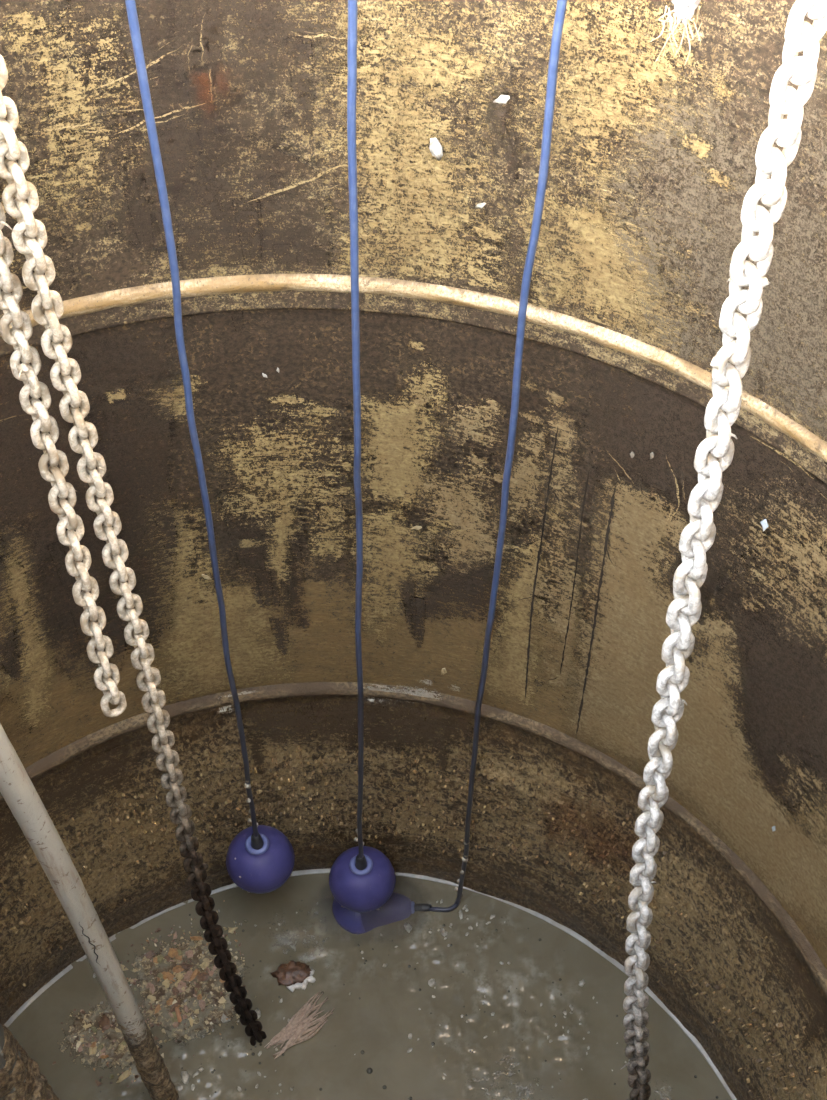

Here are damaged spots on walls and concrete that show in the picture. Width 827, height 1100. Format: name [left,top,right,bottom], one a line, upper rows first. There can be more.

leakage [218,486,310,655]
crack [519,427,616,735]